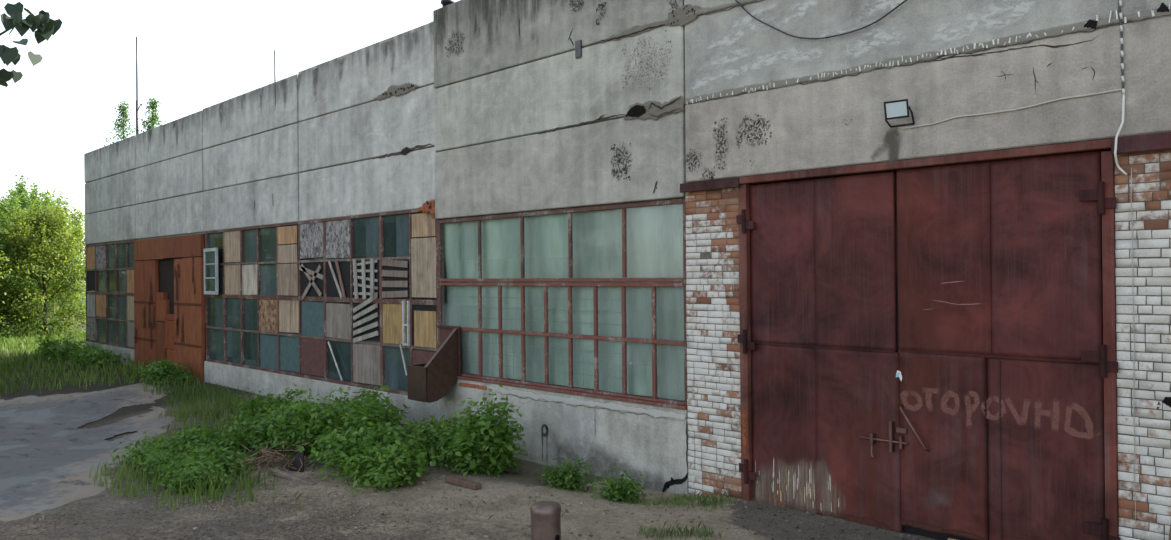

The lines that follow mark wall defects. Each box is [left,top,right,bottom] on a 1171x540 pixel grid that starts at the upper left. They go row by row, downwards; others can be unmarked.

spalling [595,0,1047,120]
spalling [374,83,417,101]
peeling [755,459,839,512]